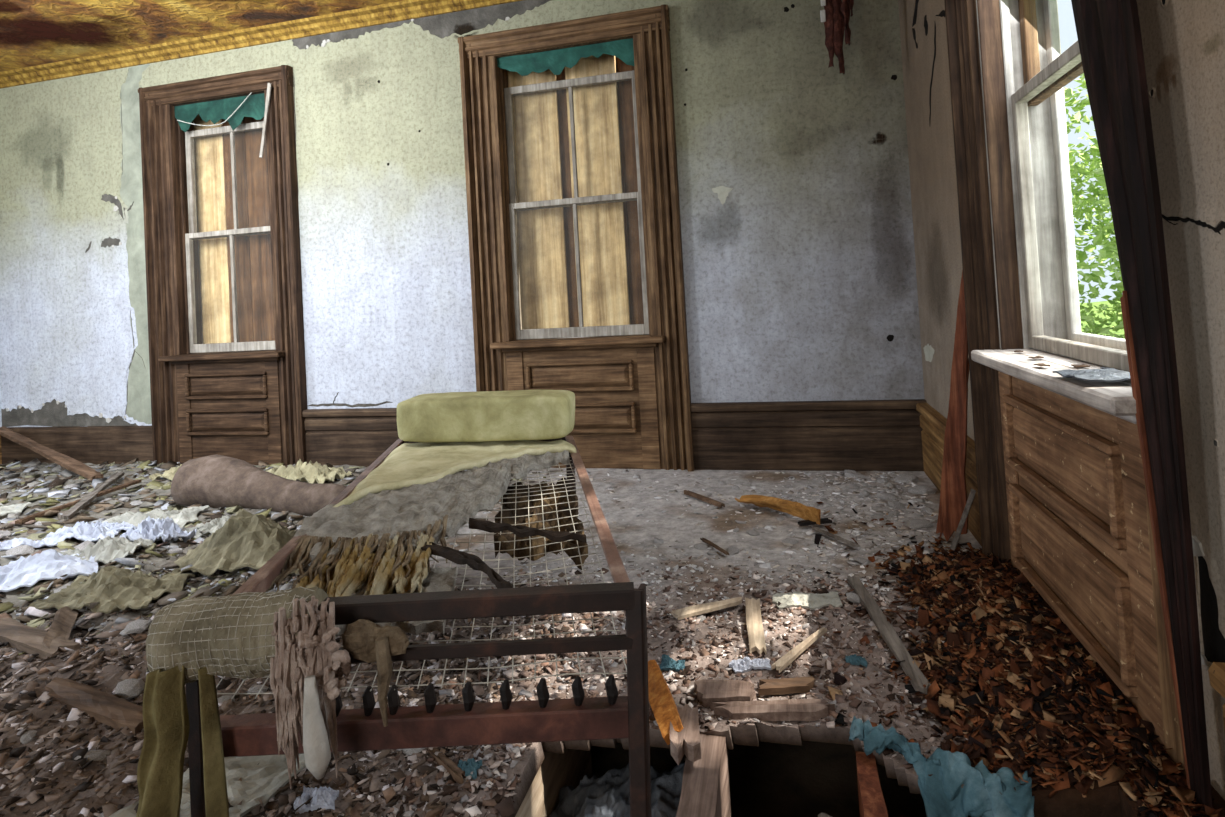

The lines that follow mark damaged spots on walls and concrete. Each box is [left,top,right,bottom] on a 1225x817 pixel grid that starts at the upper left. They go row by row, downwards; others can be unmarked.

flaking render [289,0,557,53]
crack [1160,196,1225,234]
flaking render [1,63,153,427]